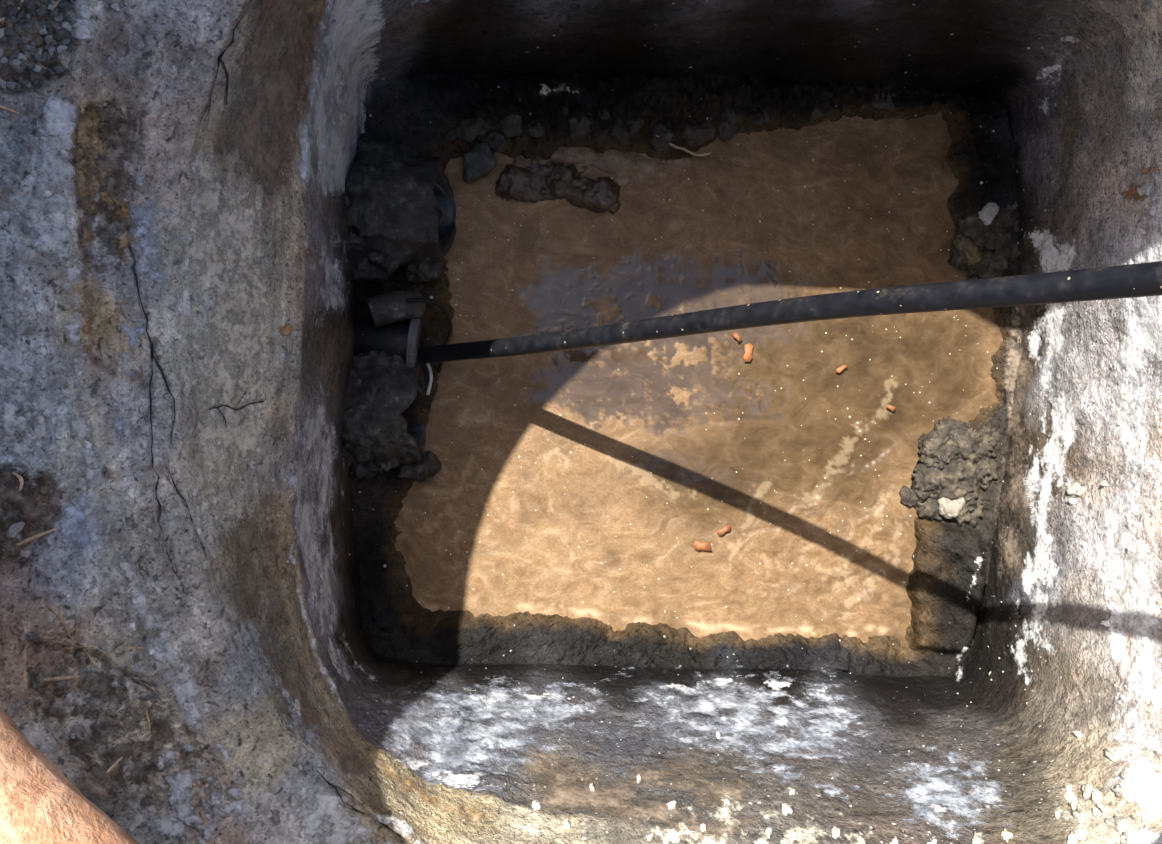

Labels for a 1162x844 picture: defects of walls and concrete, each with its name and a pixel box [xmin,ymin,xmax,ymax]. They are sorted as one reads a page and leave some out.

crack [200,0,252,124]
damp [316,232,350,322]
damp [1024,229,1077,273]
damp [1037,32,1084,191]
damp [1139,166,1162,262]
crack [127,234,207,591]
damp [222,516,324,744]
damp [285,382,868,844]
damp [999,303,1077,685]
damp [1100,296,1162,844]